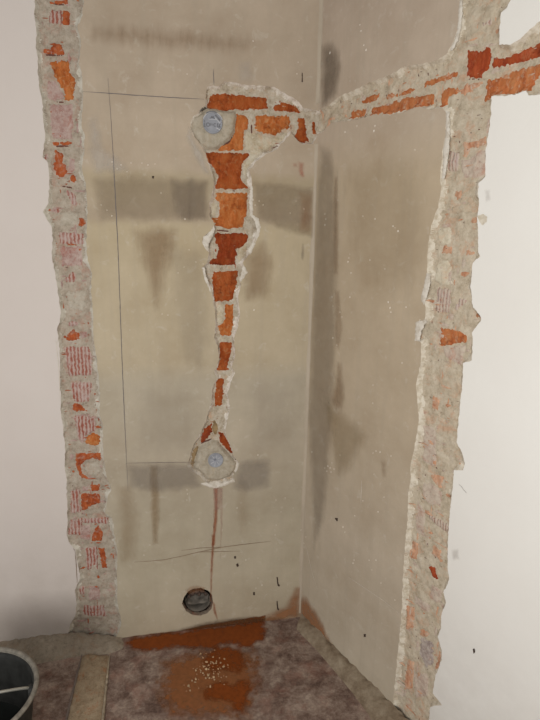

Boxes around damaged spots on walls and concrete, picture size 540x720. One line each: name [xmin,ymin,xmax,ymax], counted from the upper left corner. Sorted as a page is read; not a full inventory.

spalling [34,0,121,637]
spalling [188,0,540,720]